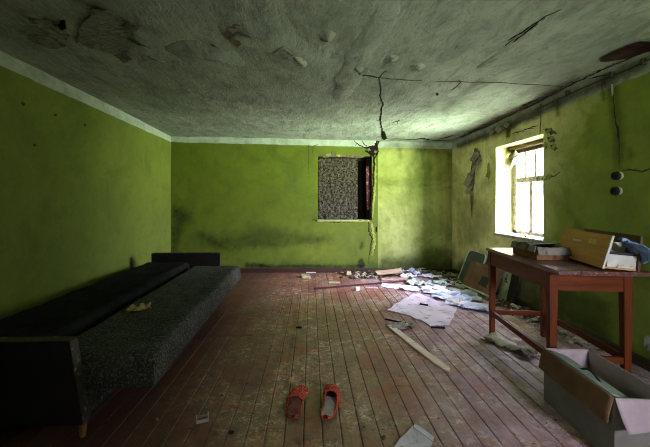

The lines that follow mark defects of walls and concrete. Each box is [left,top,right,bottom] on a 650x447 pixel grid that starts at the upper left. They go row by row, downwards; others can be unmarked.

spalling [77,8,152,63]
peeling [222,24,255,48]
crack [505,9,561,46]
peeling [463,148,491,194]
crack [354,54,641,264]
peeling [542,128,558,151]
crack [613,92,650,172]
leakage [246,259,364,268]